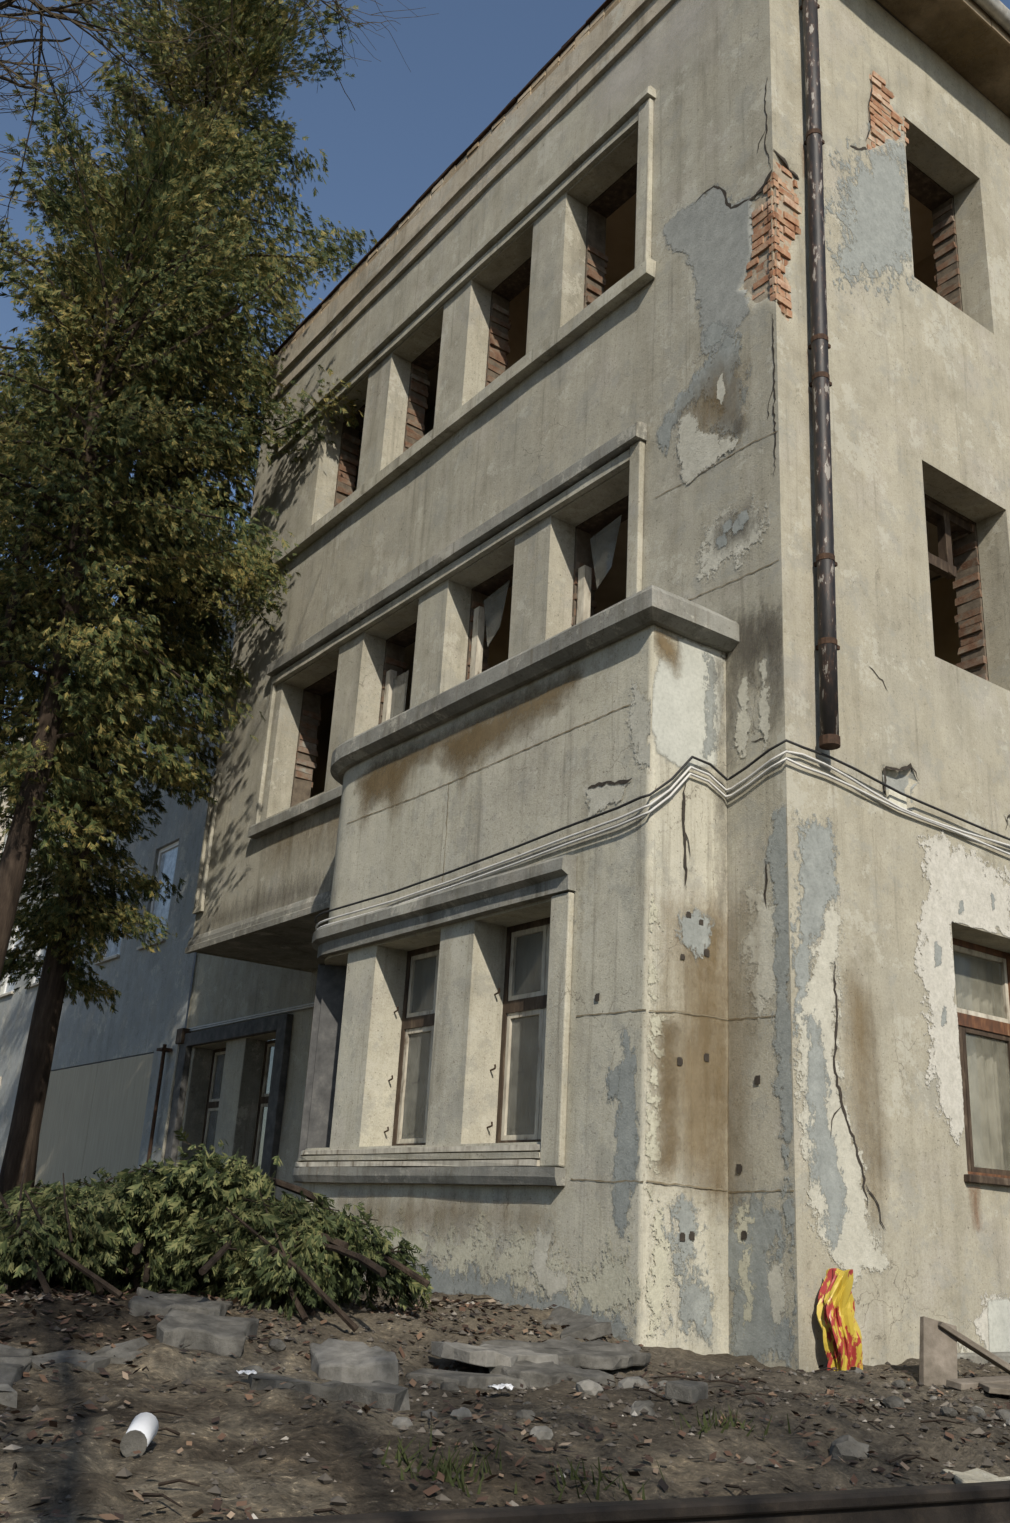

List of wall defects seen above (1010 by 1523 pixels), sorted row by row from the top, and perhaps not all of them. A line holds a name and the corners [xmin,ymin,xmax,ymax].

crack [757,79,771,168]
flaking render [850,70,909,151]
peeling [656,149,802,485]
peeling [276,805,890,1369]
crack [830,961,886,1230]
peeling [912,830,1010,1154]
peeling [957,1290,1010,1353]